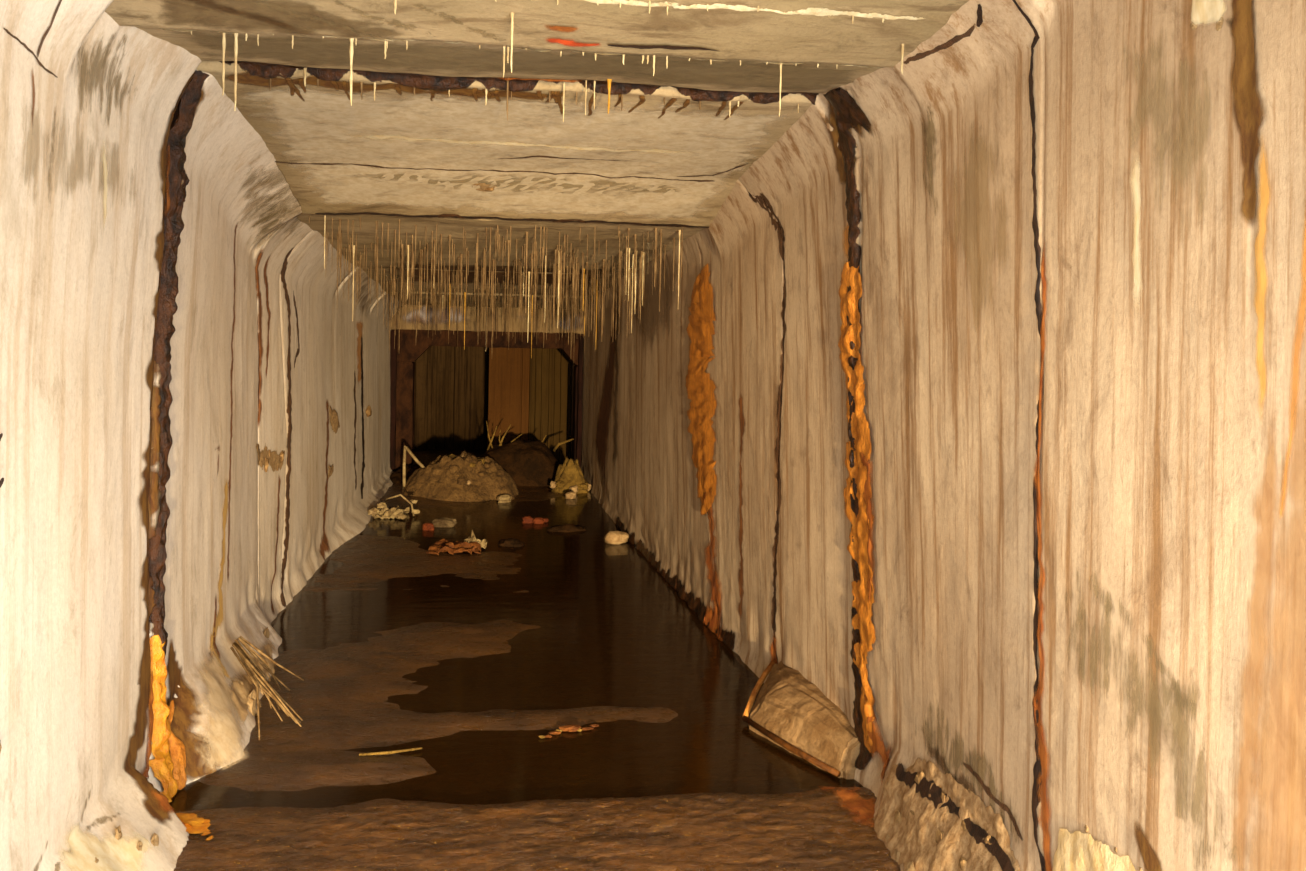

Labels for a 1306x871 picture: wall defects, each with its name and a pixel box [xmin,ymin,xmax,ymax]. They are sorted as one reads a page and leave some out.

crack [3,0,62,121]
water stain [78,36,131,123]
water stain [159,0,925,91]
crack [904,4,983,64]
water stain [399,264,607,287]
crack [35,61,872,871]
crack [963,0,1052,871]
spalling [872,757,1021,871]
peeling [1053,825,1142,871]